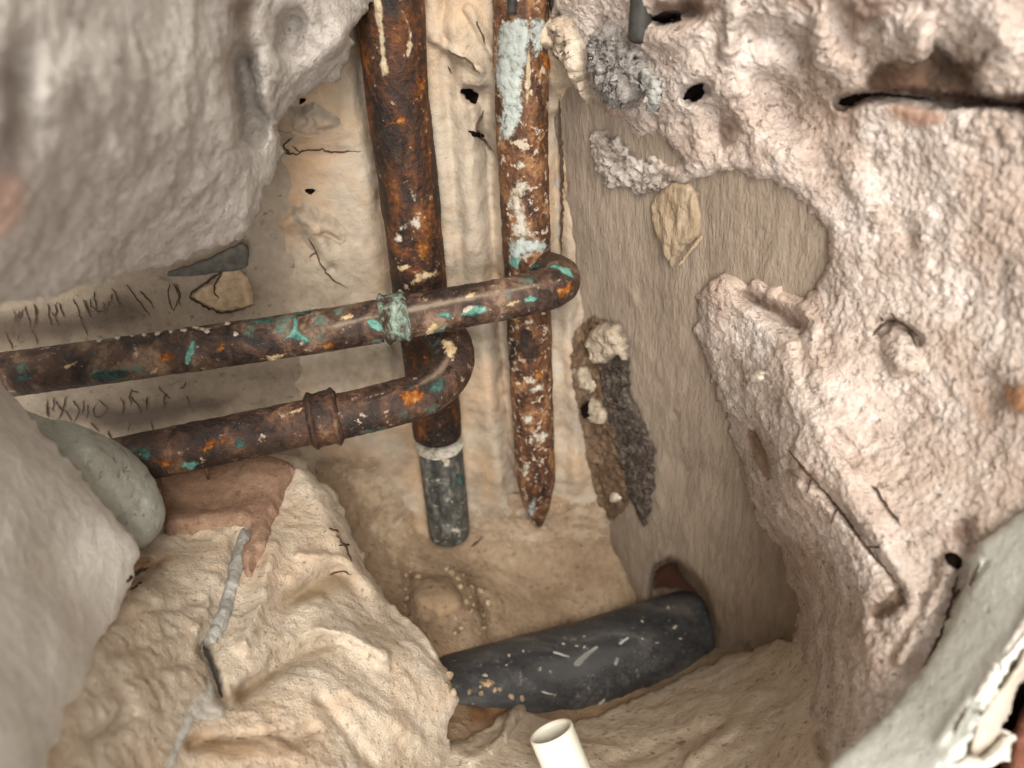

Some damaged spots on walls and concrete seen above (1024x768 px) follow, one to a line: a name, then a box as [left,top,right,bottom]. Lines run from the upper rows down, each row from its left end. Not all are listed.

crack [838,92,937,106]
crack [283,138,359,155]
spalling [720,119,738,145]
peeling [650,182,703,269]
crack [309,240,347,288]
crack [5,282,183,350]
crack [46,382,193,439]
spalling [570,316,657,527]
spalling [748,431,769,479]
crack [785,448,904,590]